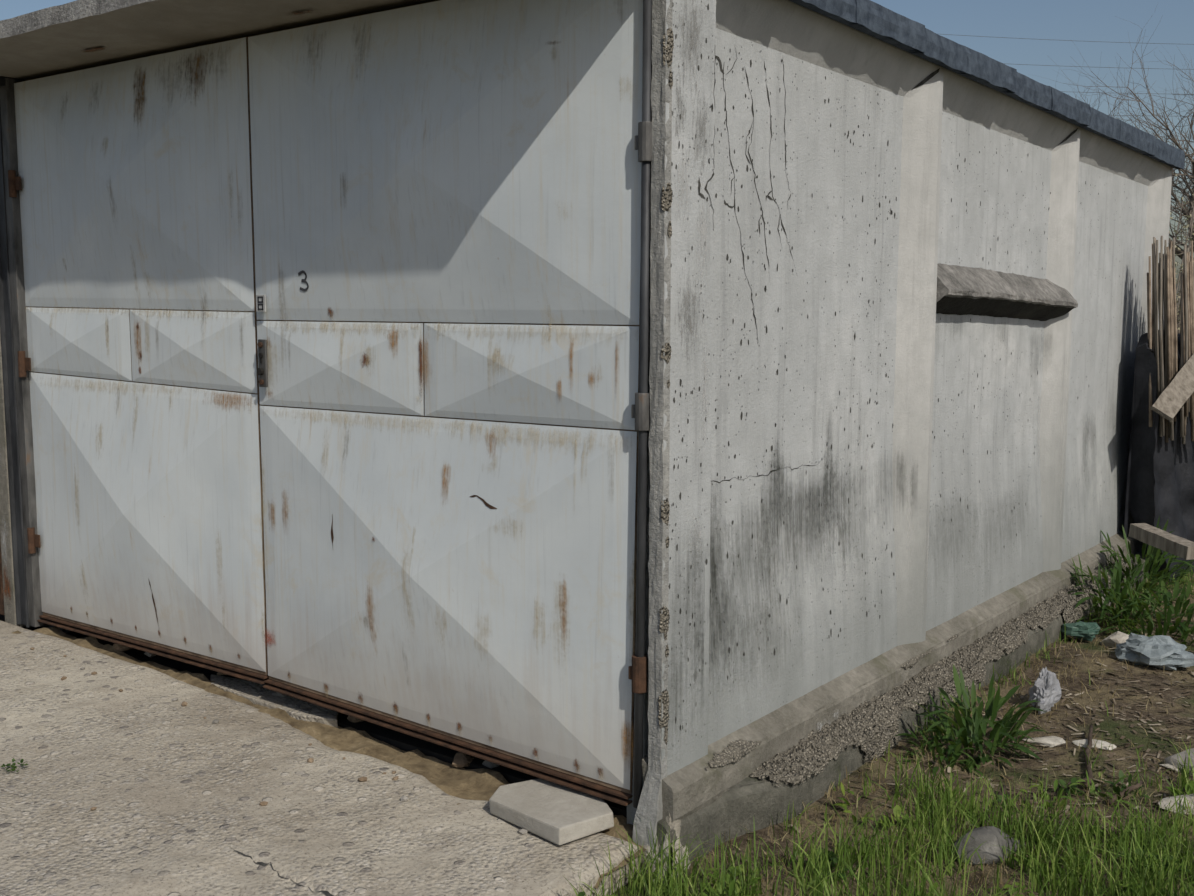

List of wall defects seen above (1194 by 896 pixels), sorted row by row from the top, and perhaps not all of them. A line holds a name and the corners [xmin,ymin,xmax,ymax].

crack [698,48,793,339]
corrosion [419,342,428,382]
spalling [705,739,762,770]
spalling [749,558,1135,787]